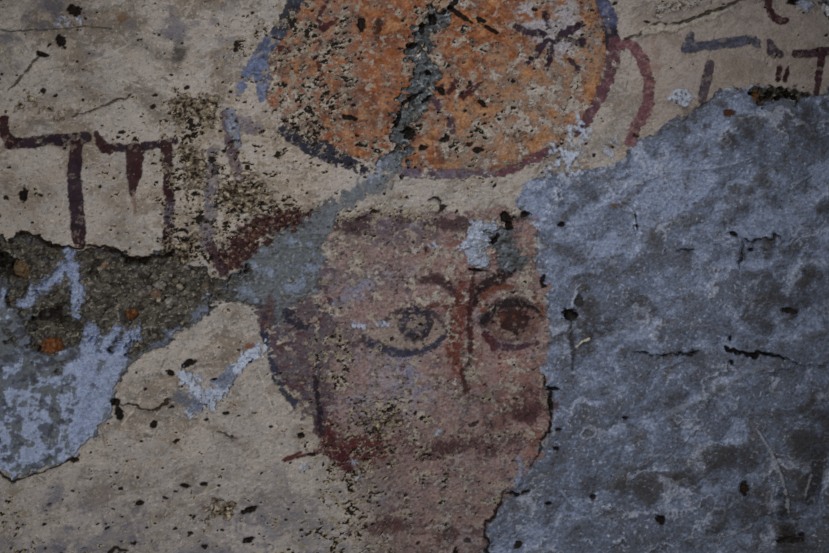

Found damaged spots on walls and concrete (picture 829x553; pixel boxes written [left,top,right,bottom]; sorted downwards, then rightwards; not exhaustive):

crack [624,0,739,40]
spalling [786,0,829,16]
spalling [748,83,811,109]
spalling [0,0,499,484]
peeling [461,211,532,273]
crack [634,349,699,357]
crack [722,336,812,369]
spalling [203,497,237,526]